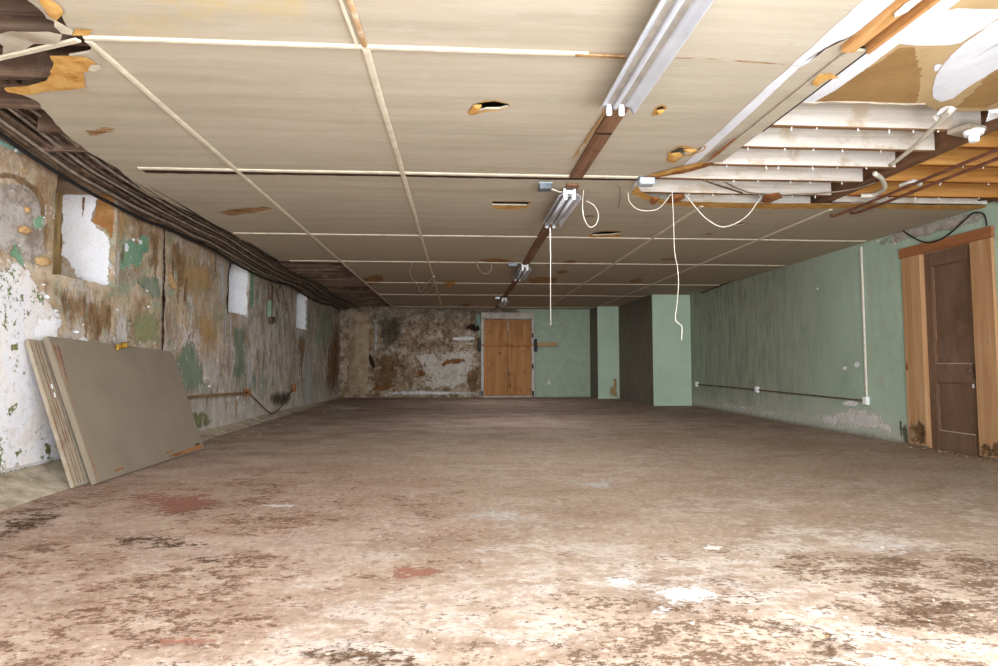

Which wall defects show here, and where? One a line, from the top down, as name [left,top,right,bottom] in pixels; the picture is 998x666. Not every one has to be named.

leakage [45,285,111,342]
peeling [0,184,181,474]
leakage [149,234,232,359]
spalling [415,315,480,391]